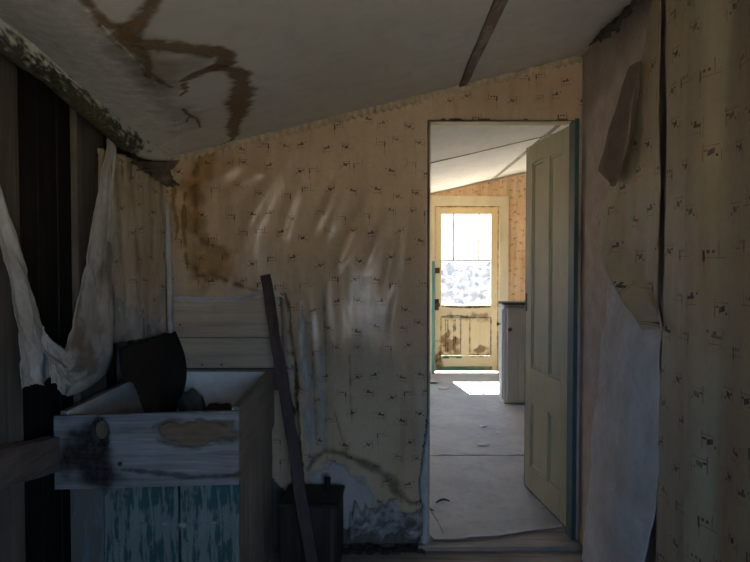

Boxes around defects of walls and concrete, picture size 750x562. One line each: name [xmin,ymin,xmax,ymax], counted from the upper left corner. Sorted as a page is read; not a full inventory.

leakage [0,27,151,155]
leakage [80,0,256,145]